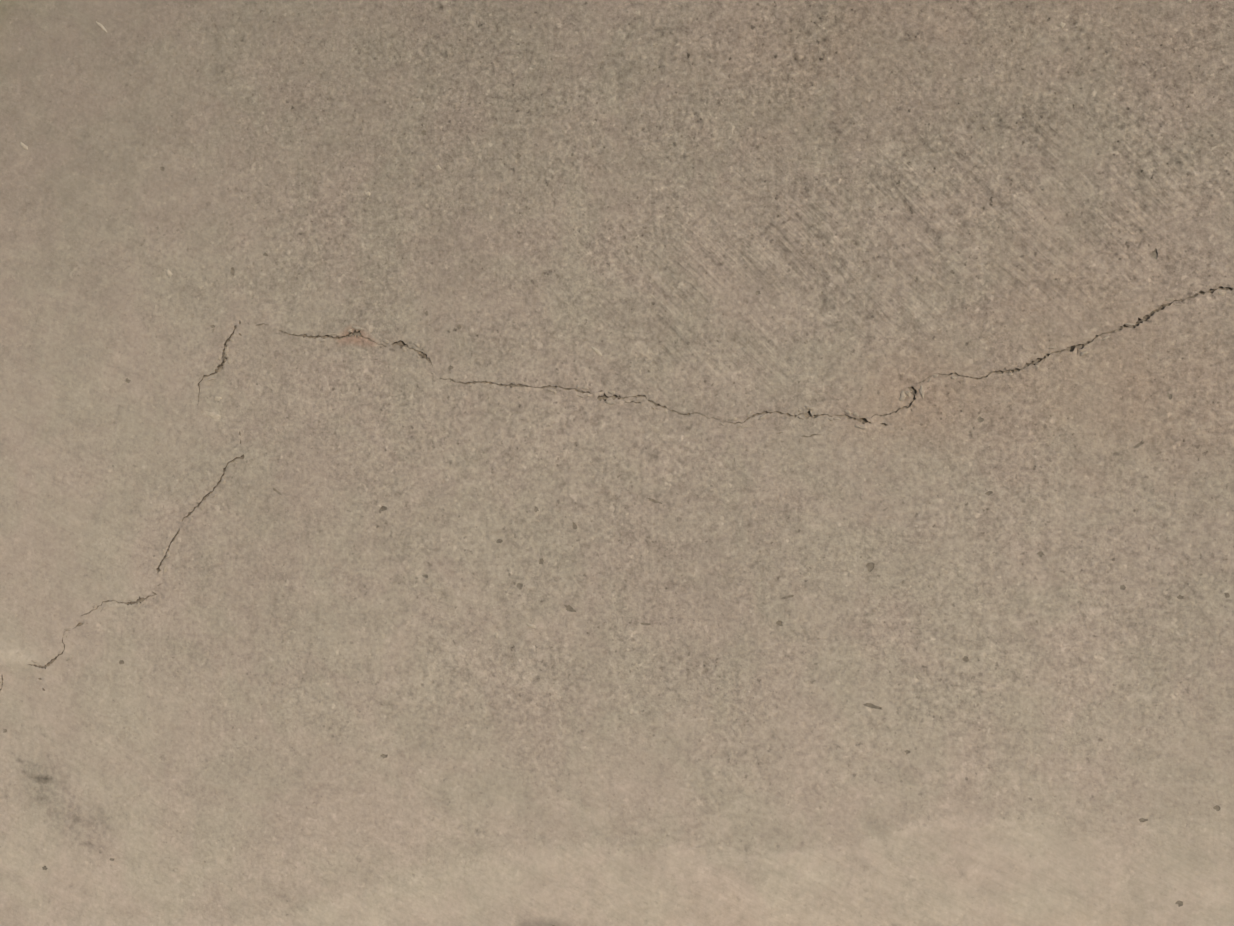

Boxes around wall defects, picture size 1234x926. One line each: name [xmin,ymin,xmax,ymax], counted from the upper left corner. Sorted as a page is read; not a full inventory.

crack [197,286,1234,437]
crack [0,431,244,691]